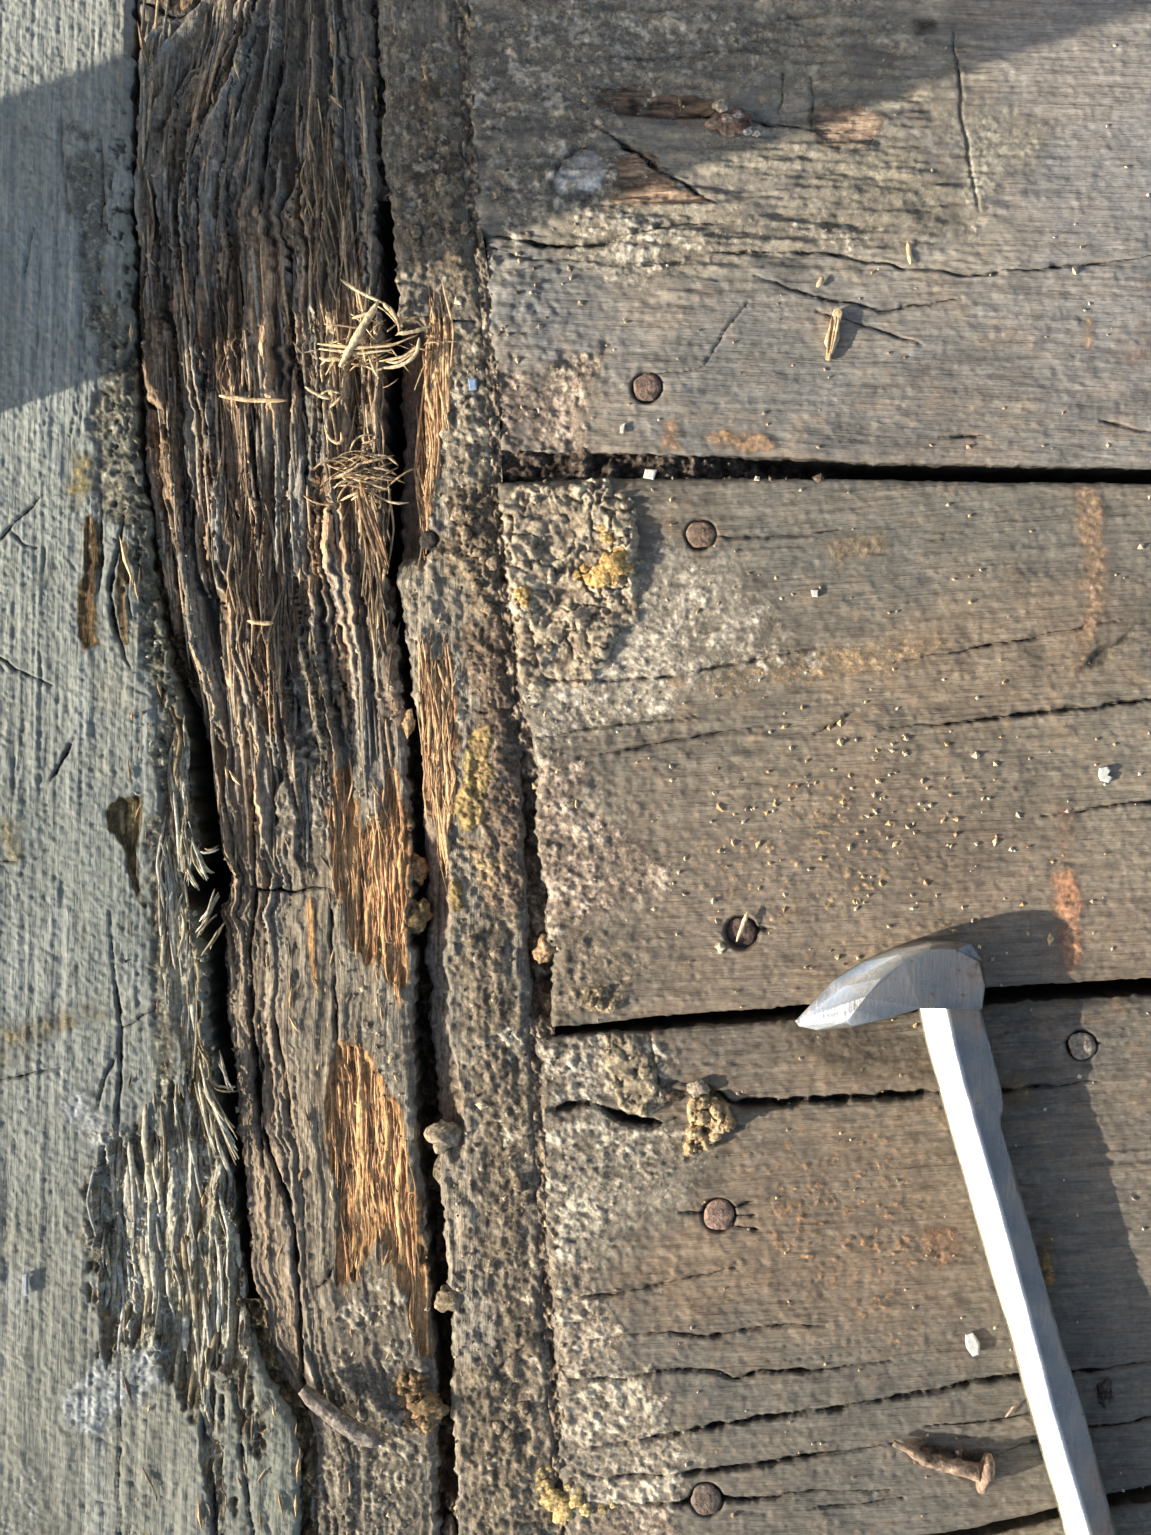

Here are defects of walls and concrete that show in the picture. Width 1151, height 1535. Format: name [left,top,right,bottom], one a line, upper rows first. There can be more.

crack [492,236,620,263]
crack [552,108,959,374]
crack [994,255,1151,274]
crack [889,698,1151,728]
crack [564,1040,681,1126]
crack [716,1089,937,1106]
peeling [323,1019,434,1364]
peeling [77,1125,173,1367]
peeling [397,1382,432,1433]
crack [597,1323,1038,1449]
crack [571,1443,901,1508]
rust [904,1440,990,1482]